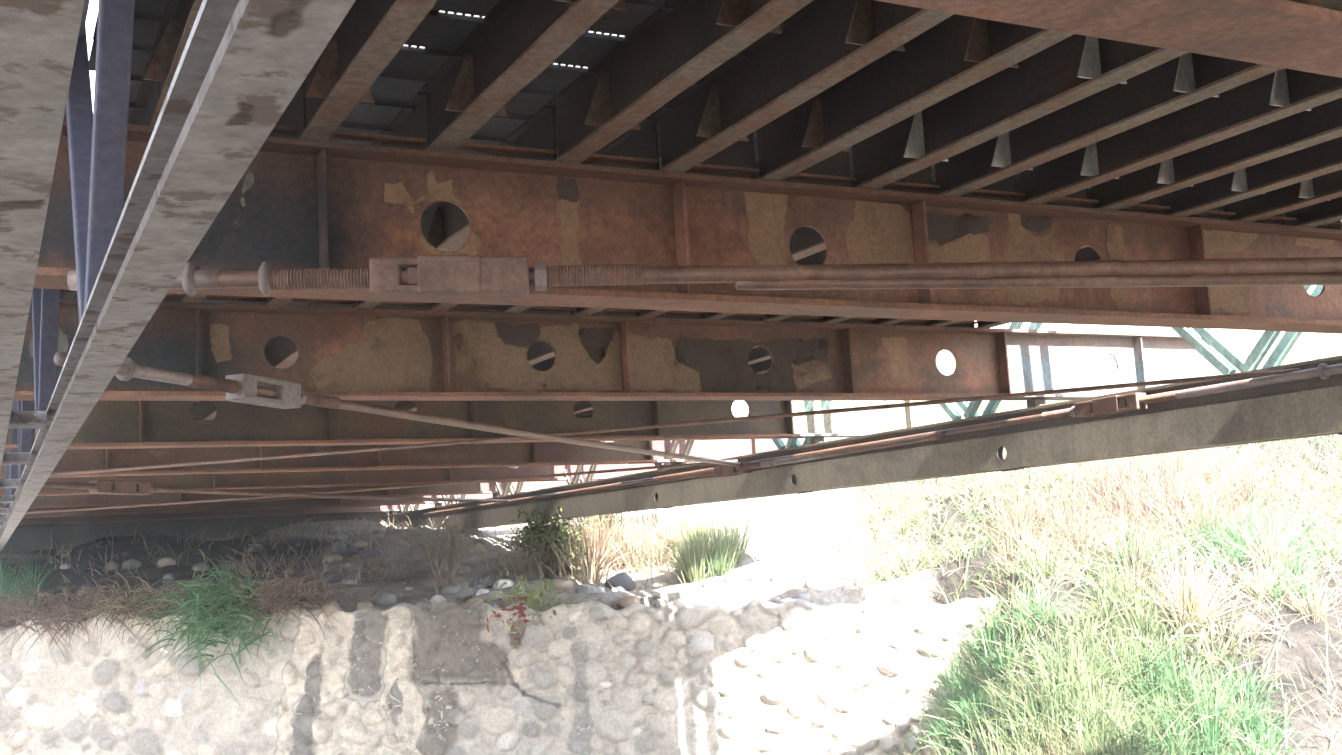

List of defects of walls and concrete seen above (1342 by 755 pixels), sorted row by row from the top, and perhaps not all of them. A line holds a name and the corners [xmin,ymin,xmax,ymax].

peeling [384,168,463,214]
peeling [556,199,582,266]
peeling [743,192,788,265]
corrosion [926,211,990,246]
corrosion [1020,214,1052,233]
corrosion [495,321,541,347]
peeling [452,319,701,393]
corrosion [578,327,614,363]
corrosion [675,337,828,393]
leakage [274,599,507,755]